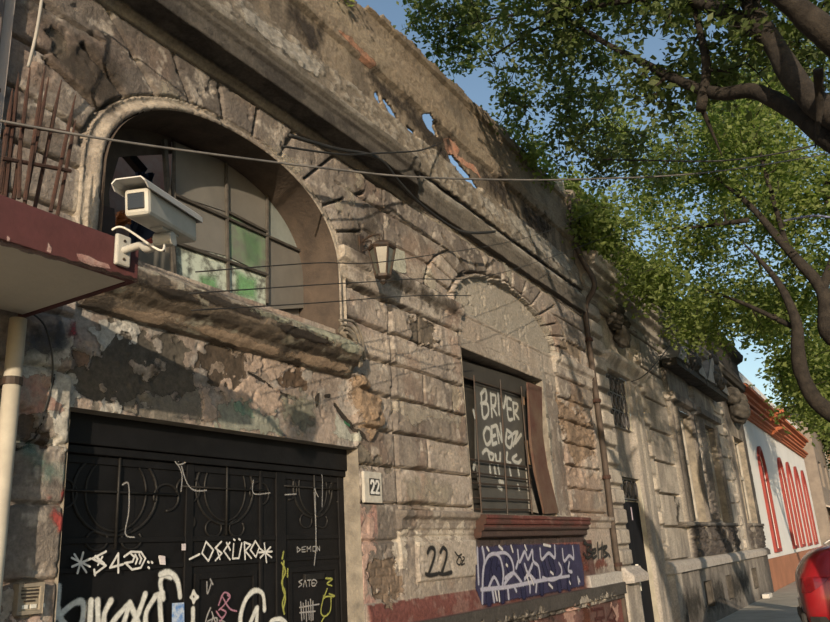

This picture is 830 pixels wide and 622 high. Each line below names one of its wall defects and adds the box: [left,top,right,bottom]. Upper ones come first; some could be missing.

damp [288,6,324,50]
damp [368,66,451,159]
flaking render [443,138,481,178]
damp [519,193,552,237]
flaking render [16,308,351,449]
flaking render [365,519,465,610]
damp [685,574,749,622]